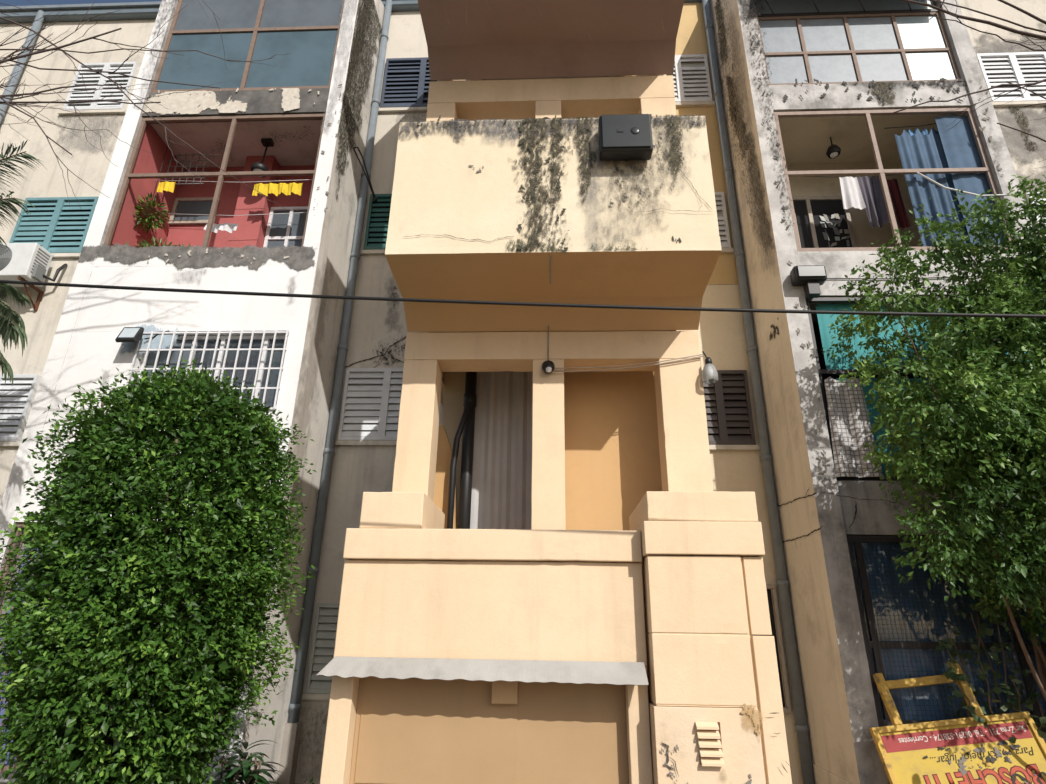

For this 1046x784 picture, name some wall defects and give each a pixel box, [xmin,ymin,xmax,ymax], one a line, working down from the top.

peeling [142,88,247,115]
peeling [269,88,320,111]
water stain [324,0,382,199]
water stain [449,119,467,140]
water stain [714,0,772,267]
water stain [486,114,690,253]
crack [778,489,903,528]
crack [661,742,679,782]